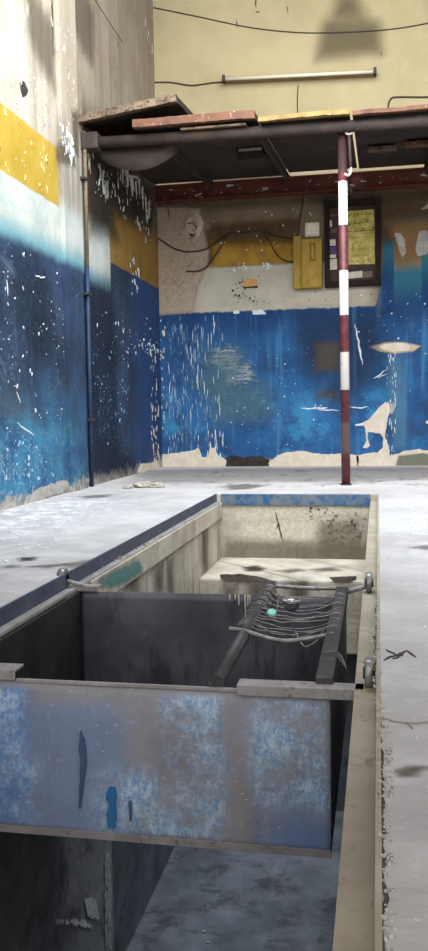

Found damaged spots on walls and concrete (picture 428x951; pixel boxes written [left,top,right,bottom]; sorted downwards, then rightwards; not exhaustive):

peeling [51,1,77,167]
peeling [87,153,428,473]
crack [373,593,428,951]